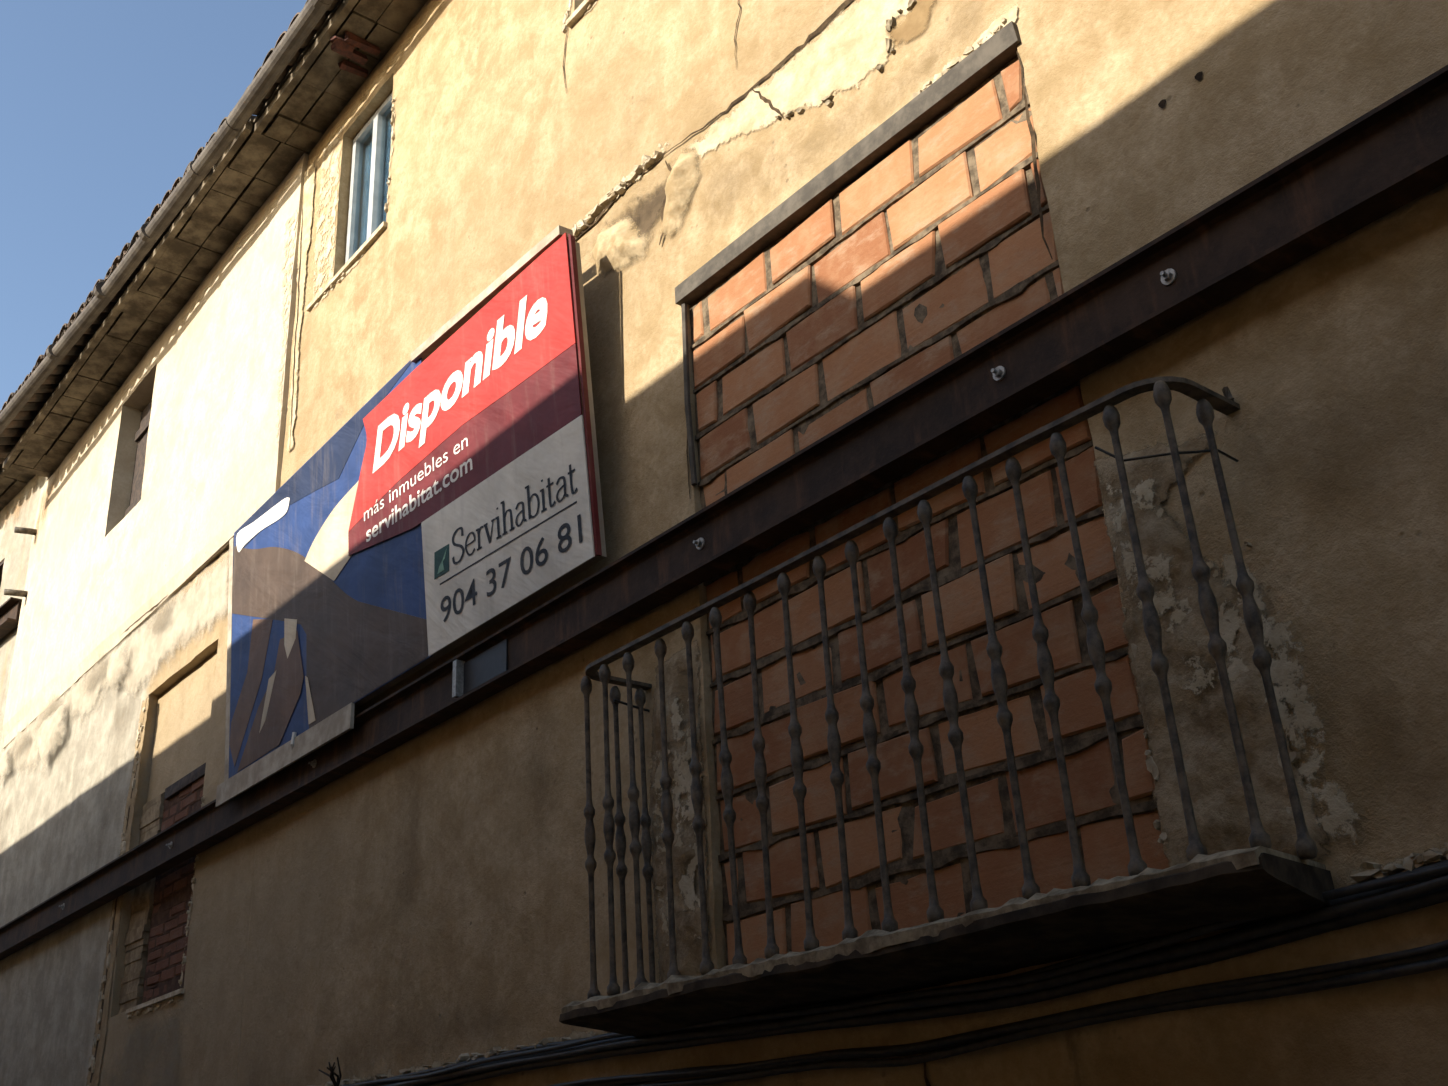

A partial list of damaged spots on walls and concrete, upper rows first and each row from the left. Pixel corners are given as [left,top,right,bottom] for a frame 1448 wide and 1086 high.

flaking render [561,0,597,34]
crack [575,0,853,245]
peeling [571,0,917,239]
flaking render [912,5,1017,99]
peeling [1094,432,1360,867]